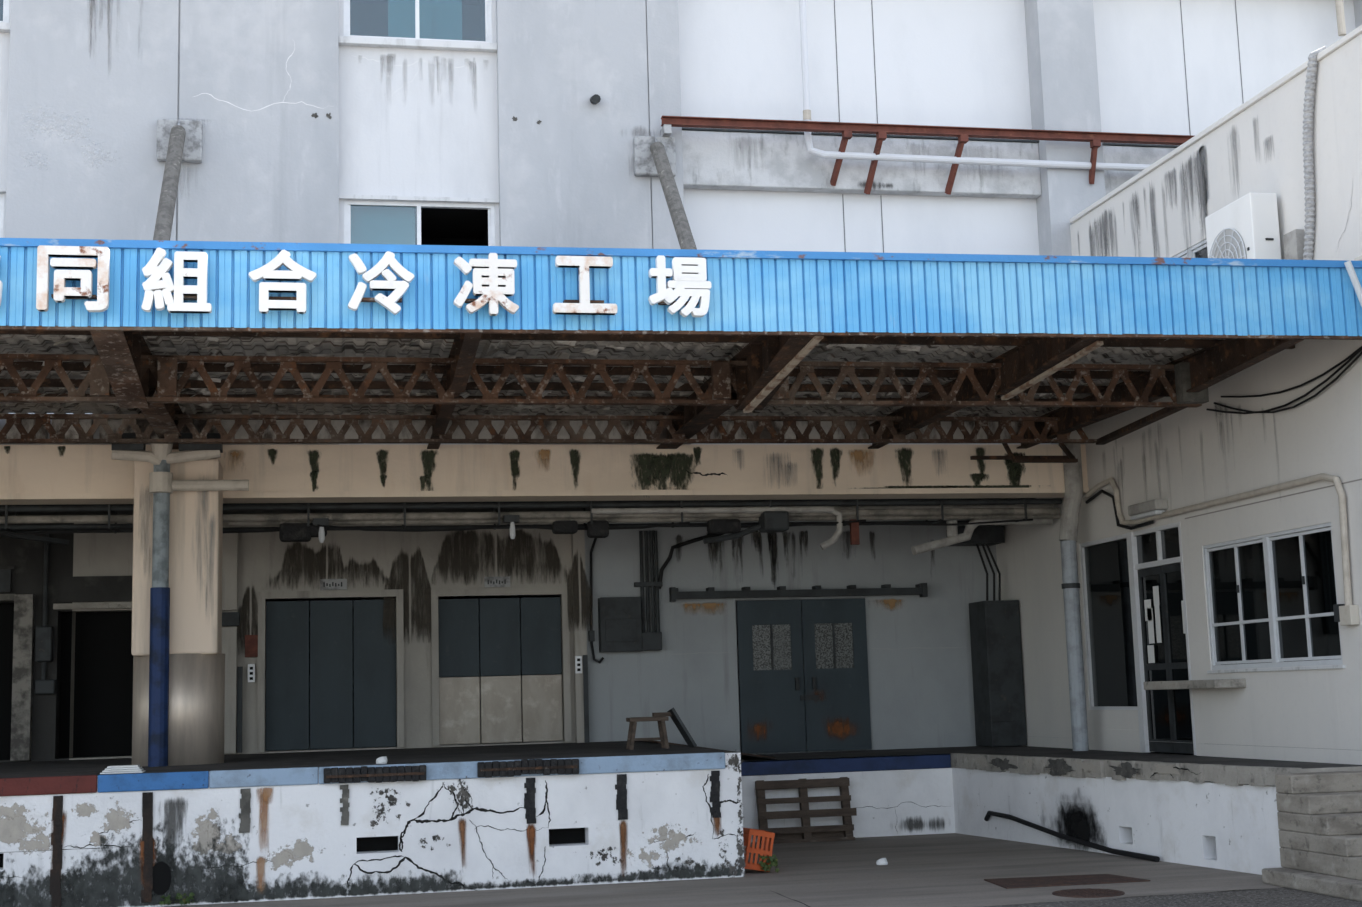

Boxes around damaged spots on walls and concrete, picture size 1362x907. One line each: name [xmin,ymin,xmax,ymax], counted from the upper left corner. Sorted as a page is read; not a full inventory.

rust [180,337,245,413]
rust [457,341,624,416]
rust [811,336,995,362]
peeling [0,803,52,855]
peeling [71,801,138,846]
rust [259,788,273,841]
crack [347,780,551,890]
rust [458,819,466,855]
rust [526,824,535,868]
rust [257,857,265,889]